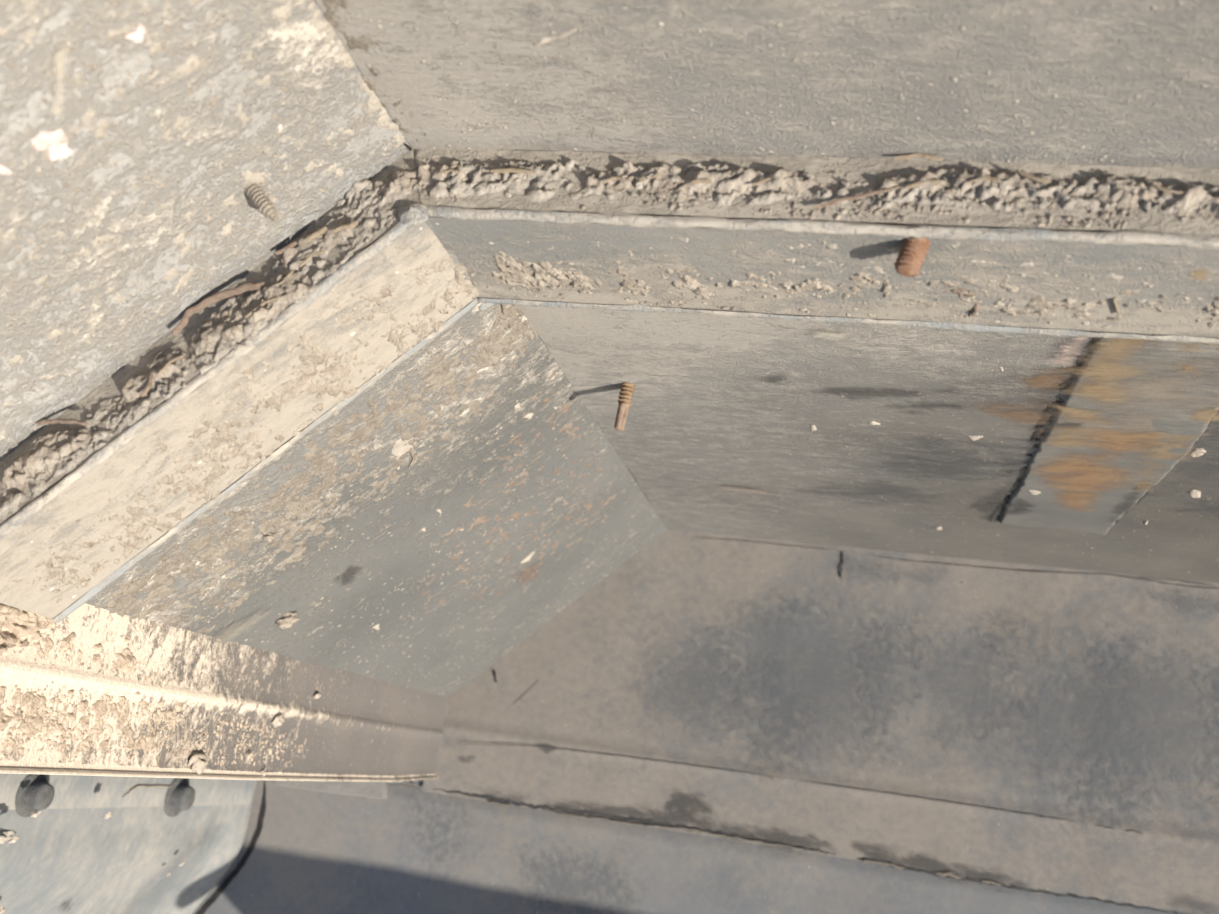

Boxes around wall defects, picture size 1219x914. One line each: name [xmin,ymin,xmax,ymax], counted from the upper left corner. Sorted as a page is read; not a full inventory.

crack [989,337,1094,522]
corrosion [1078,339,1137,401]